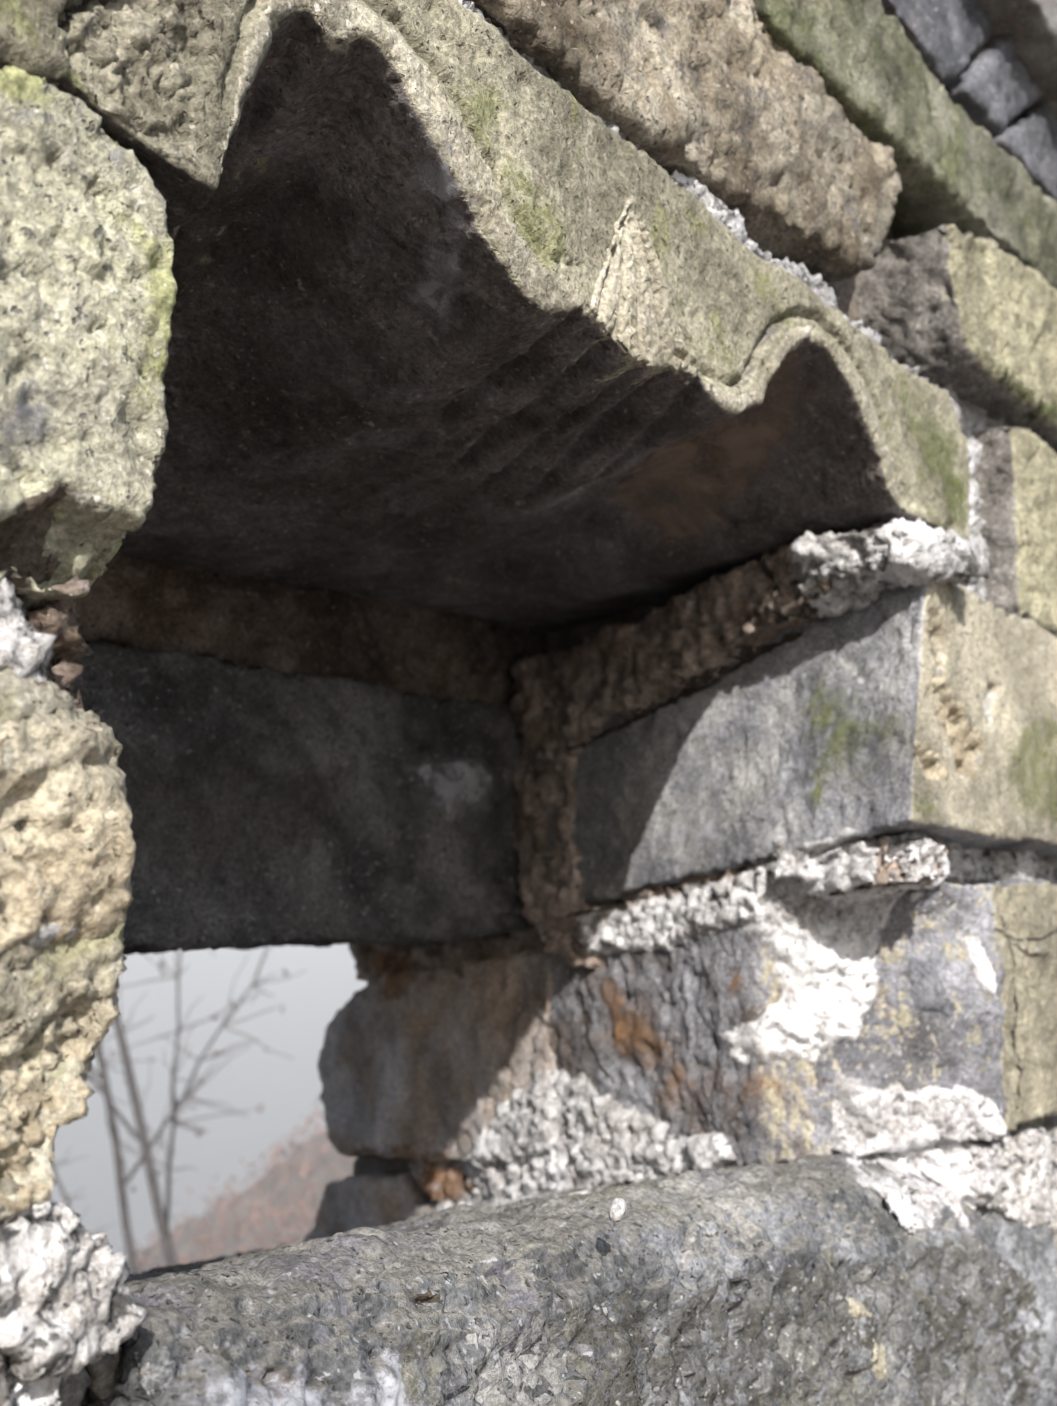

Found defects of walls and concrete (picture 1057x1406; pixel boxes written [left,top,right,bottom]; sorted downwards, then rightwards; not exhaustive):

crack [996,908,1057,1110]